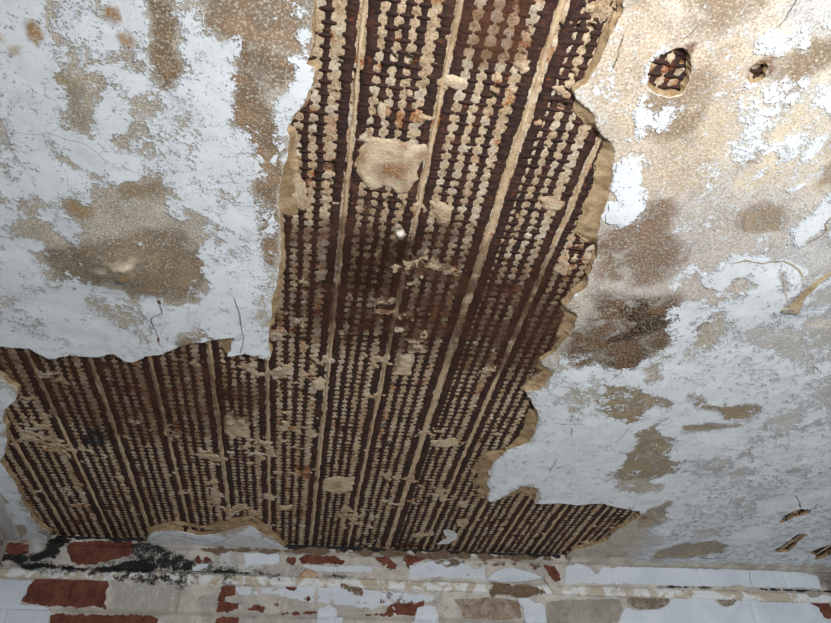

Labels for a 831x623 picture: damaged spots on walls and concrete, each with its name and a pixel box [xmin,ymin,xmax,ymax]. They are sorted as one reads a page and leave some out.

water stain [208,0,312,265]
spalling [624,45,692,143]
water stain [47,230,204,298]
spalling [0,0,651,558]
water stain [566,295,707,372]
peeling [487,254,831,511]
water stain [597,384,685,480]
peeling [630,422,831,567]
peeling [0,579,158,623]
water stain [0,530,561,596]
water stain [489,582,546,598]
peeling [403,554,821,589]